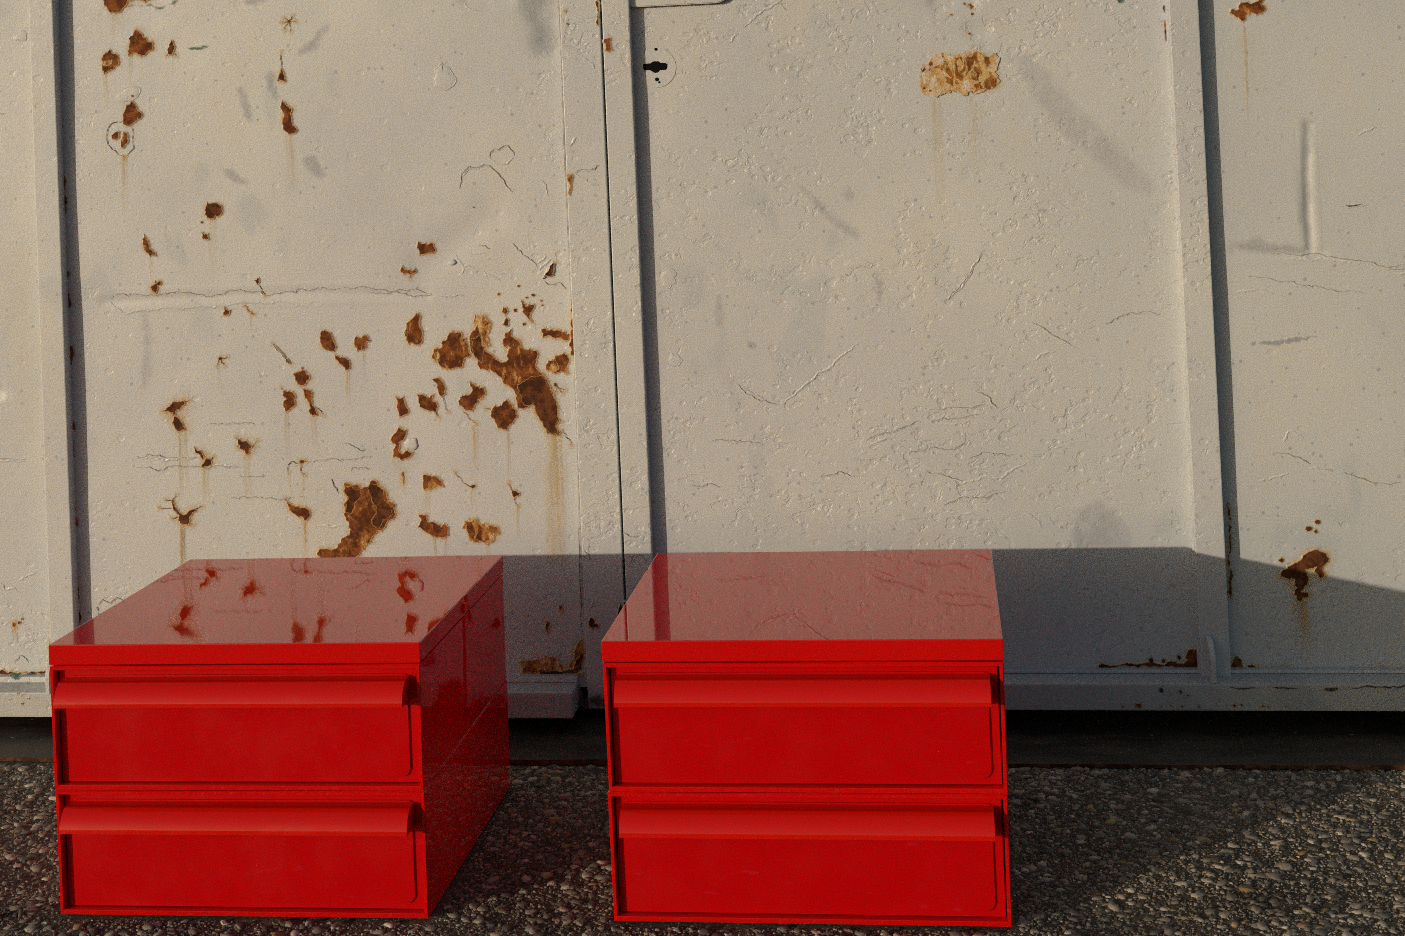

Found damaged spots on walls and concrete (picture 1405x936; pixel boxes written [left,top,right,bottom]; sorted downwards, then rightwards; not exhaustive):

corrosion [103,0,150,14]
corrosion [1228,0,1267,23]
corrosion [101,29,176,75]
corrosion [919,52,1000,98]
corrosion [106,95,144,166]
corrosion [279,100,298,135]
corrosion [201,201,224,241]
corrosion [142,234,157,257]
corrosion [273,344,322,417]
corrosion [316,285,571,558]
corrosion [285,499,312,538]
corrosion [1278,520,1331,621]